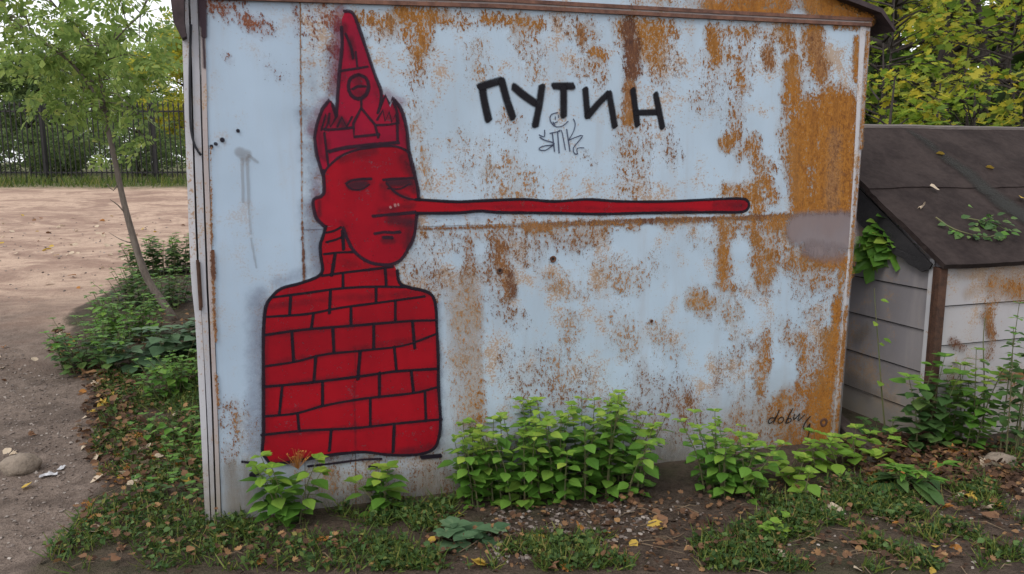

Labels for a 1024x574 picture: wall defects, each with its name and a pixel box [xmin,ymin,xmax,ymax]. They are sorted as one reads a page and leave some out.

rust [207,0,277,41]
rust [209,147,218,343]
rust [291,0,875,453]
rust [212,373,261,466]